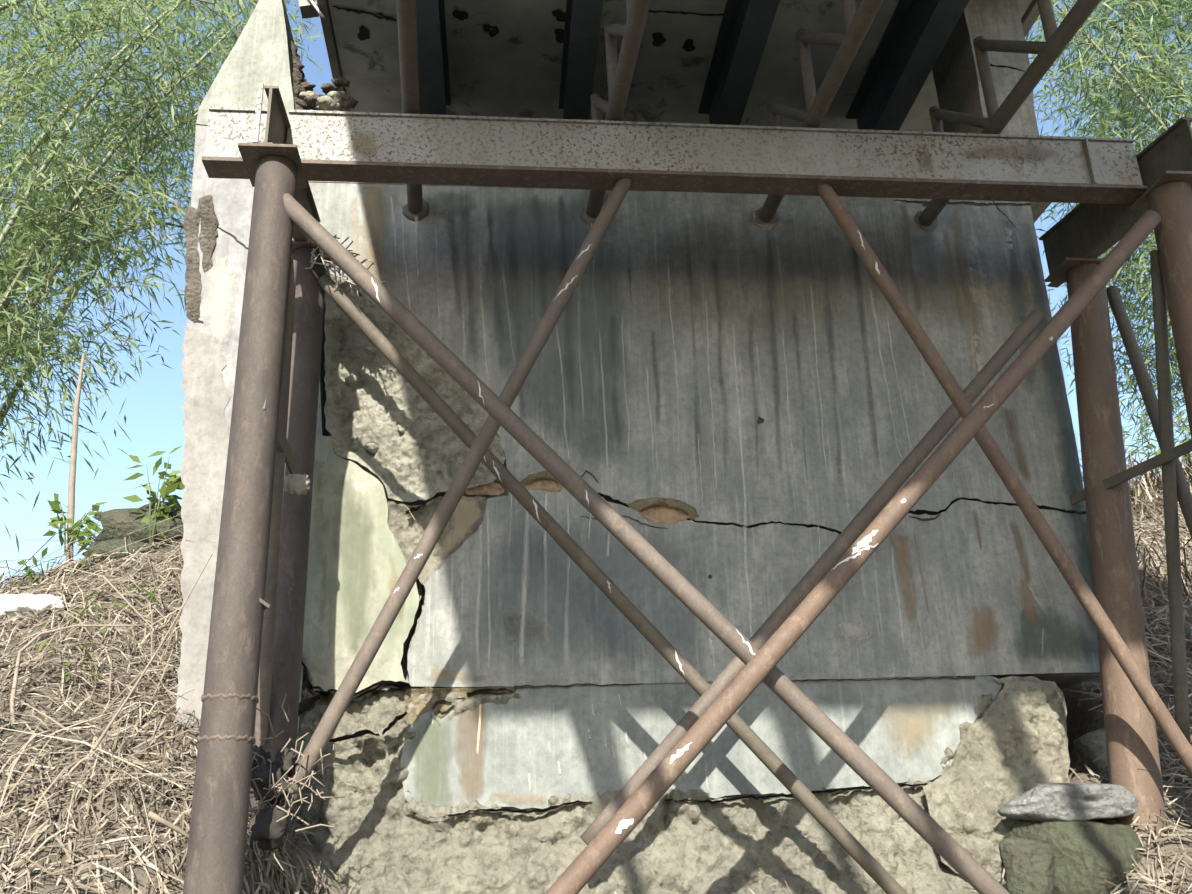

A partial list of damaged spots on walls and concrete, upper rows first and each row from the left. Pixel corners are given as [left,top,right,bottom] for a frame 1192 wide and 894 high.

peeling [176,195,230,731]
spalling [324,272,488,563]
crack [405,494,445,515]
spalling [418,462,505,585]
water stain [496,201,594,364]
water stain [526,237,623,450]
crack [580,470,865,534]
crack [908,498,1086,521]
crack [298,583,424,743]
spalling [403,686,514,727]
spalling [923,676,1070,878]